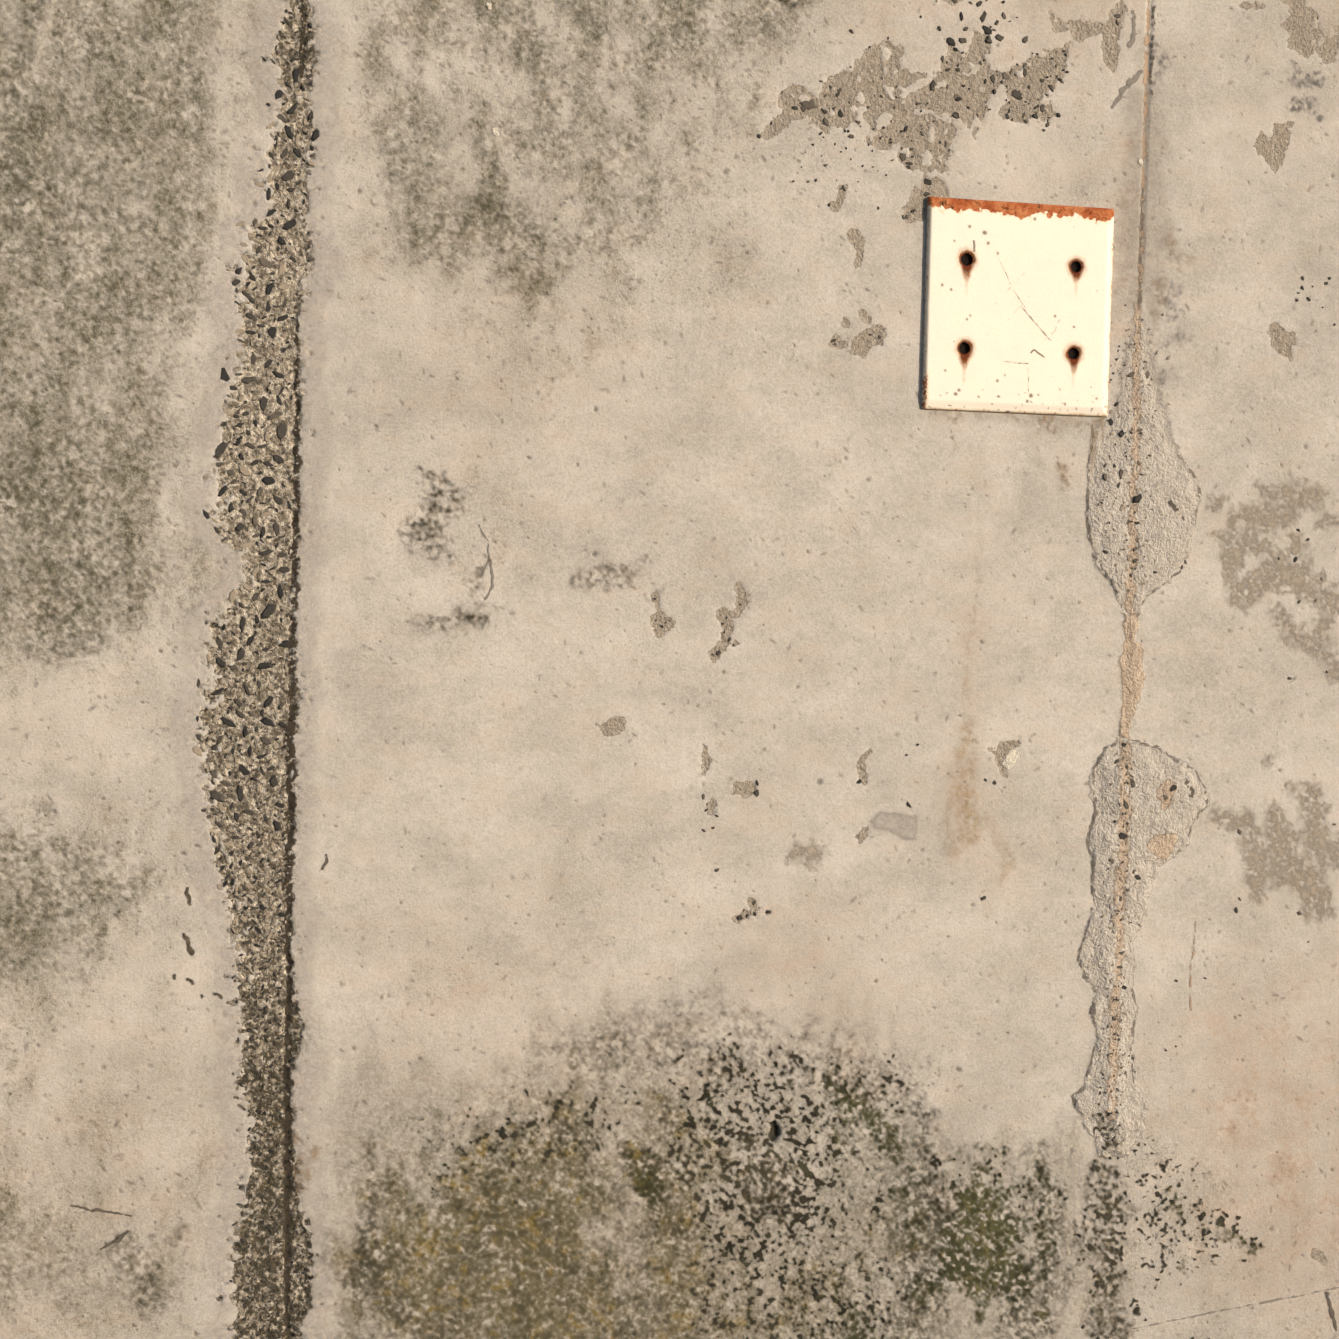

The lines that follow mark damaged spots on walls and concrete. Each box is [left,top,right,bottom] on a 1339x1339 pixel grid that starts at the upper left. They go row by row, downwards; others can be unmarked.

damp [24,0,62,58]
spalling [757,0,1128,223]
crack [1111,0,1156,309]
spalling [1280,0,1339,64]
rust [957,340,973,365]
rust [959,250,976,277]
rust [1065,345,1081,369]
rust [1068,259,1084,280]
spalling [173,0,324,1339]
spalling [1211,485,1339,680]
damp [647,1033,859,1326]
damp [1067,1103,1262,1339]